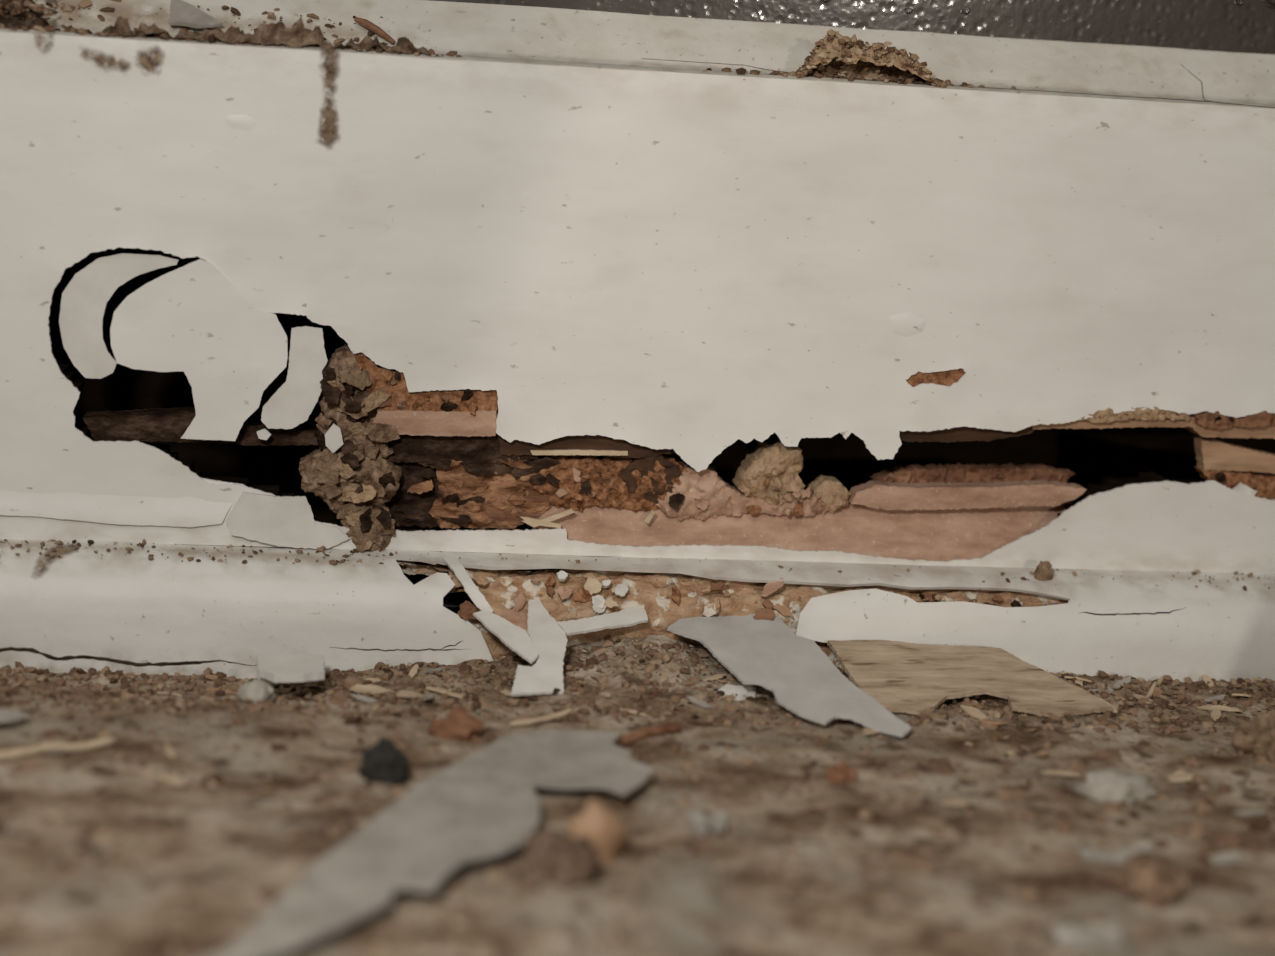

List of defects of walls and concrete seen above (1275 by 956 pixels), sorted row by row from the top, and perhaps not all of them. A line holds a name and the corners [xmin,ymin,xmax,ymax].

peeling [59,253,328,441]
spalling [906,368,965,387]
peeling [0,490,233,527]
peeling [546,467,611,500]
peeling [666,477,685,509]
peeling [782,480,824,516]
peeling [443,556,493,613]
crack [0,647,257,667]
peeling [257,654,325,683]
crack [329,640,464,651]
peeling [511,597,648,697]